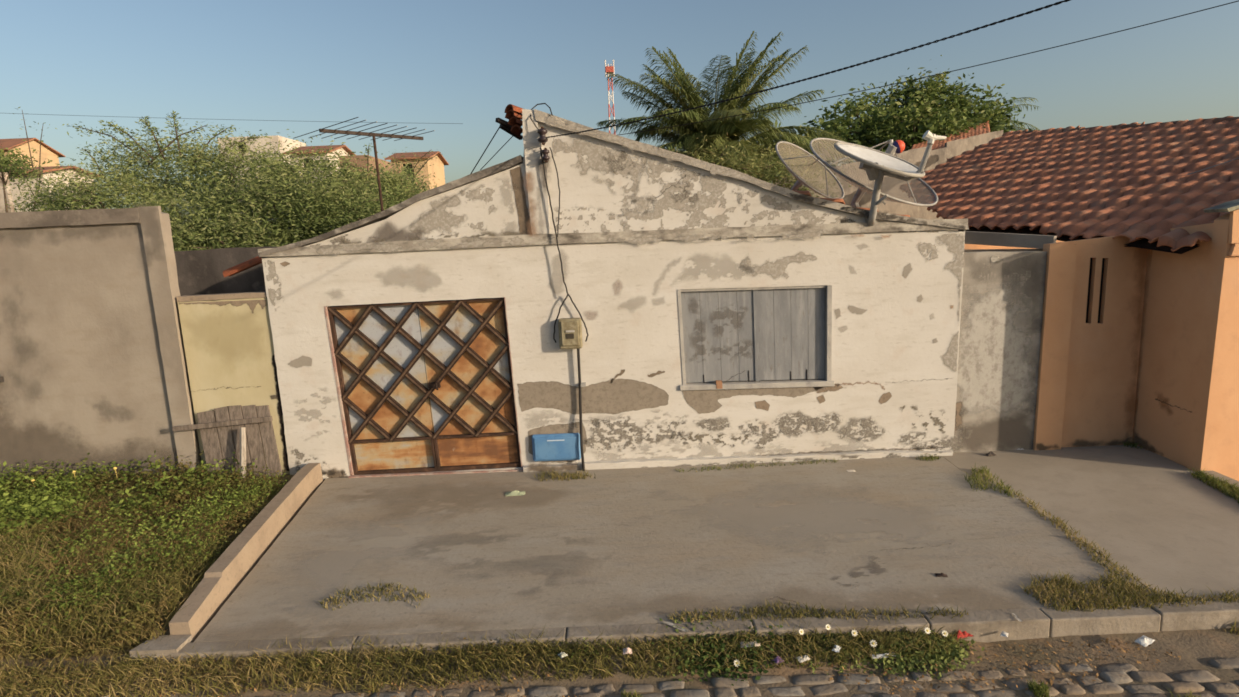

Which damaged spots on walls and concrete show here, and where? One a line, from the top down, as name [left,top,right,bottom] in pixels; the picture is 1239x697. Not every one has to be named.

peeling [552,138,853,278]
peeling [835,306,866,318]
peeling [288,356,312,368]
spalling [517,369,843,463]
peeling [292,449,343,478]